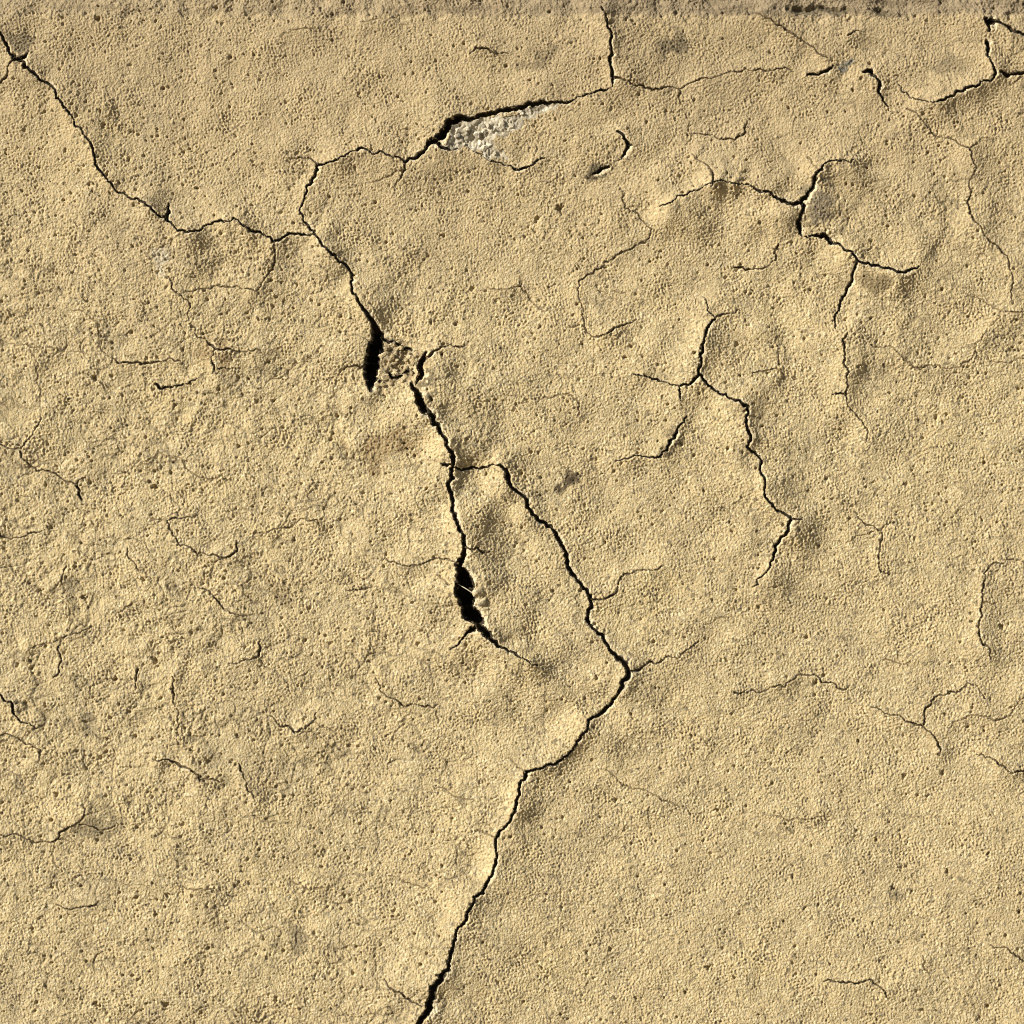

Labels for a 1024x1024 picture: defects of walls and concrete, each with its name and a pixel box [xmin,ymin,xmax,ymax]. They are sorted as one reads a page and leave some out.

crack [807,65,834,76]
spalling [444,103,558,161]
crack [862,17,1024,369]
crack [659,154,920,331]
crack [832,332,869,454]
crack [0,7,803,1024]
crack [839,512,893,574]
crack [977,559,1024,660]
crack [734,674,851,695]
crack [871,682,1024,756]
crack [976,753,1024,774]
crack [823,979,890,999]